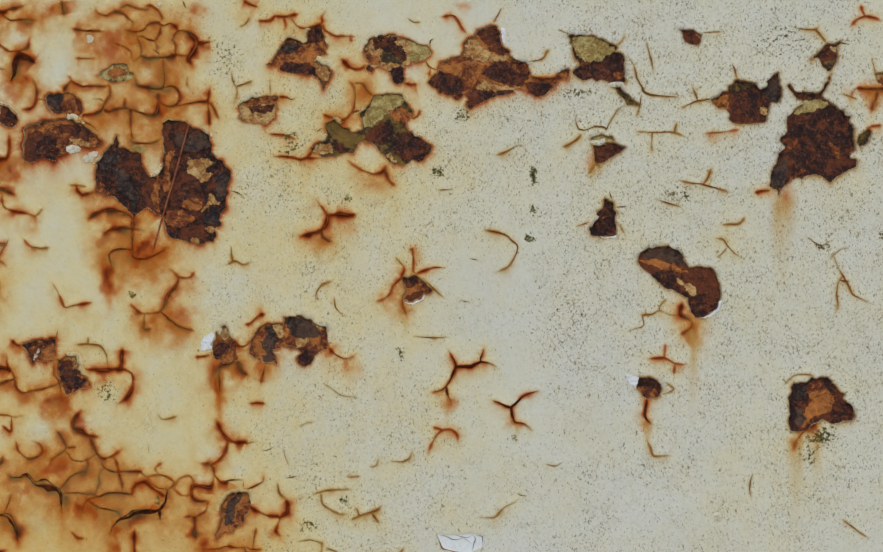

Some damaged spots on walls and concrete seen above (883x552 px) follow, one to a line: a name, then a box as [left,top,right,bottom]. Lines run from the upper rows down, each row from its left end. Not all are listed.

crack [0,0,219,151]
corrosion [93,27,145,65]
peeling [309,17,639,168]
peeling [706,43,870,195]
peeling [0,91,233,250]
crack [71,184,195,336]
corrosion [100,232,170,296]
crack [299,204,356,246]
peeling [632,240,724,319]
corrosion [40,392,72,417]
corrosion [213,373,225,409]
crack [415,336,496,399]